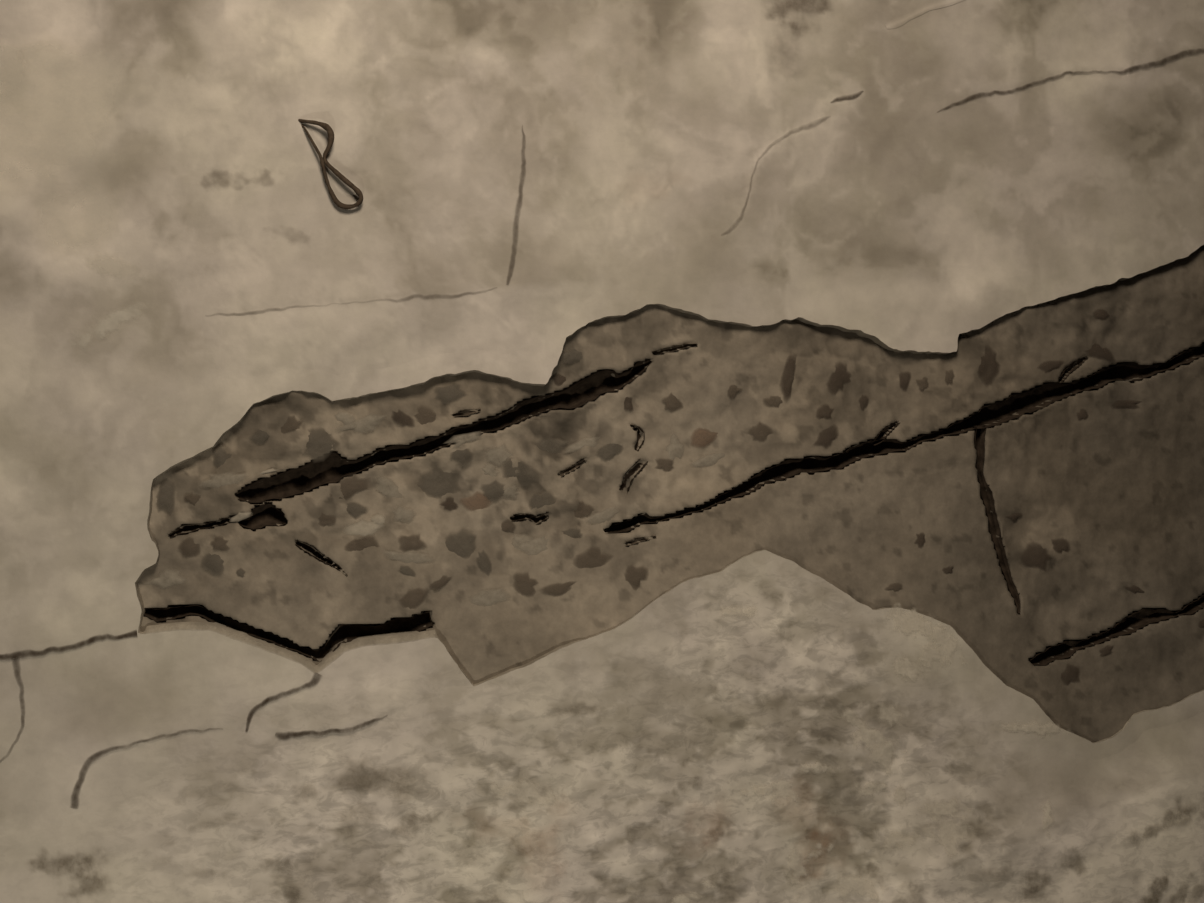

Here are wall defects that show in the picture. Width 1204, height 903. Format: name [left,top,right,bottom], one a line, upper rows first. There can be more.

crack [835,91,863,101]
crack [945,72,1082,109]
crack [1119,50,1201,73]
crack [168,344,697,576]
crack [605,343,1204,614]
crack [1029,593,1204,666]
crack [0,605,433,732]
crack [278,719,376,739]
crack [72,740,148,807]